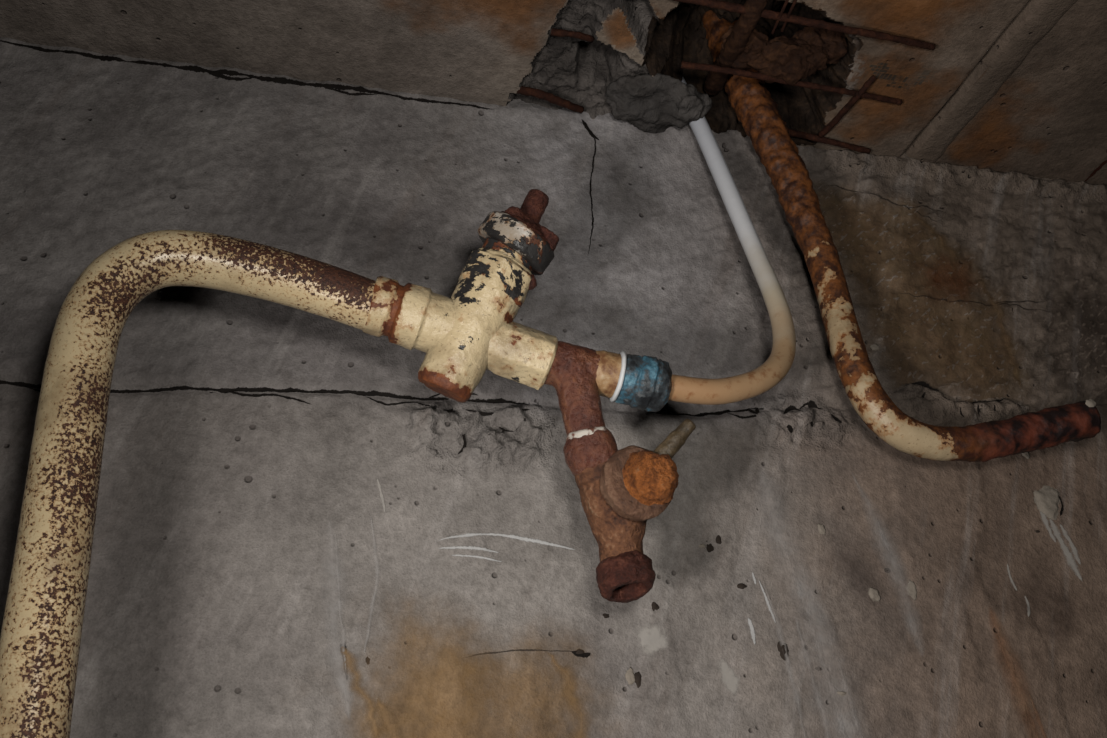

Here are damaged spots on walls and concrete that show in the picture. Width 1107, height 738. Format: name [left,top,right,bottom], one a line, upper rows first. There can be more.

crack [0,40,490,109]
spalling [506,0,747,137]
spalling [755,0,864,146]
corrosion [847,57,950,139]
crack [0,380,41,392]
crack [110,386,525,406]
spalling [401,396,561,476]
crack [674,407,764,419]